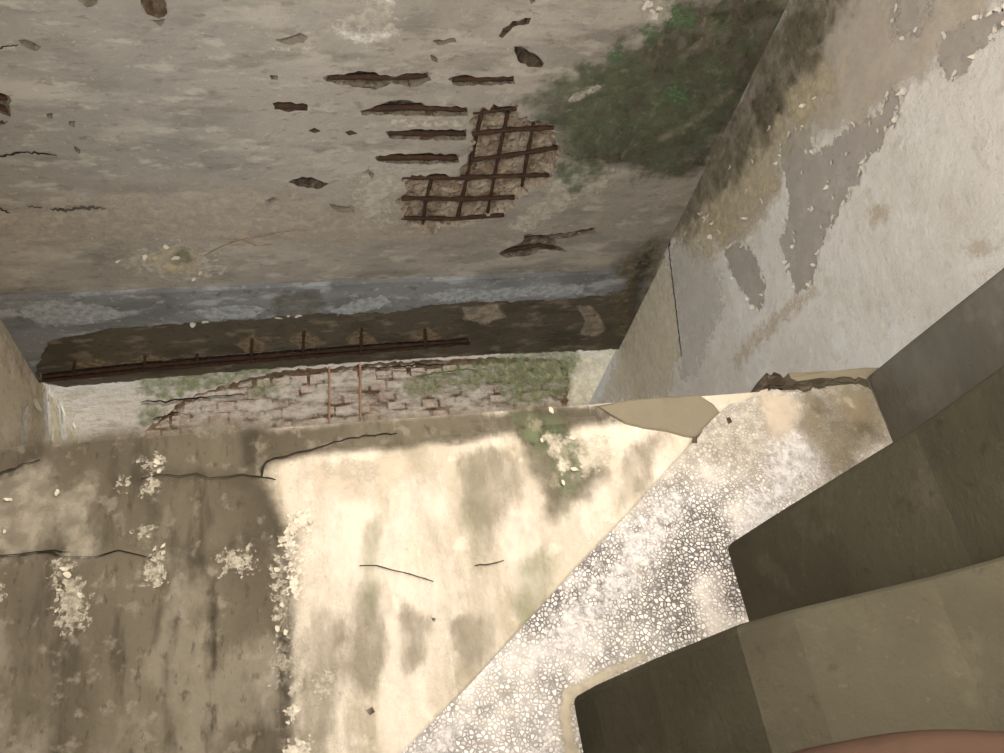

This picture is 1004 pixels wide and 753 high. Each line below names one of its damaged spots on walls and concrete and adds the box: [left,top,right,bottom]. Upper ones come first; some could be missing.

spalling [323,71,431,90]
spalling [448,75,515,86]
spalling [273,102,308,112]
spalling [360,100,562,234]
peeling [778,86,907,294]
spalling [499,227,596,258]
water stain [543,0,987,539]
crack [0,459,40,475]
crack [142,433,397,480]
crack [0,549,151,558]
water stain [0,411,543,753]
water stain [530,492,684,658]